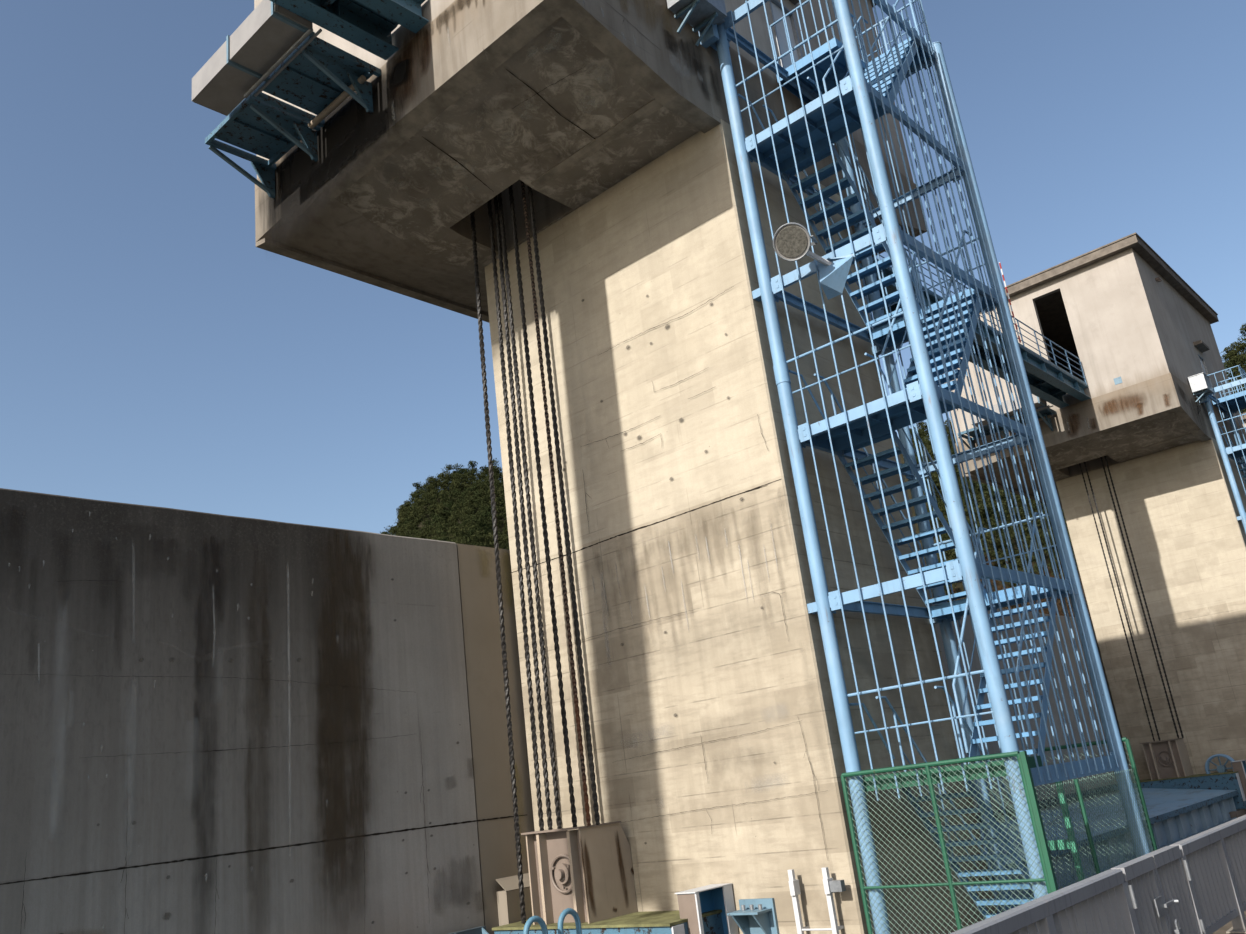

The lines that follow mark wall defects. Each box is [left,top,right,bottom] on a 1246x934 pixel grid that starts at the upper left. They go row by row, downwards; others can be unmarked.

damp [440,0,484,26]
rust [1068,396,1143,435]
damp [319,531,370,864]